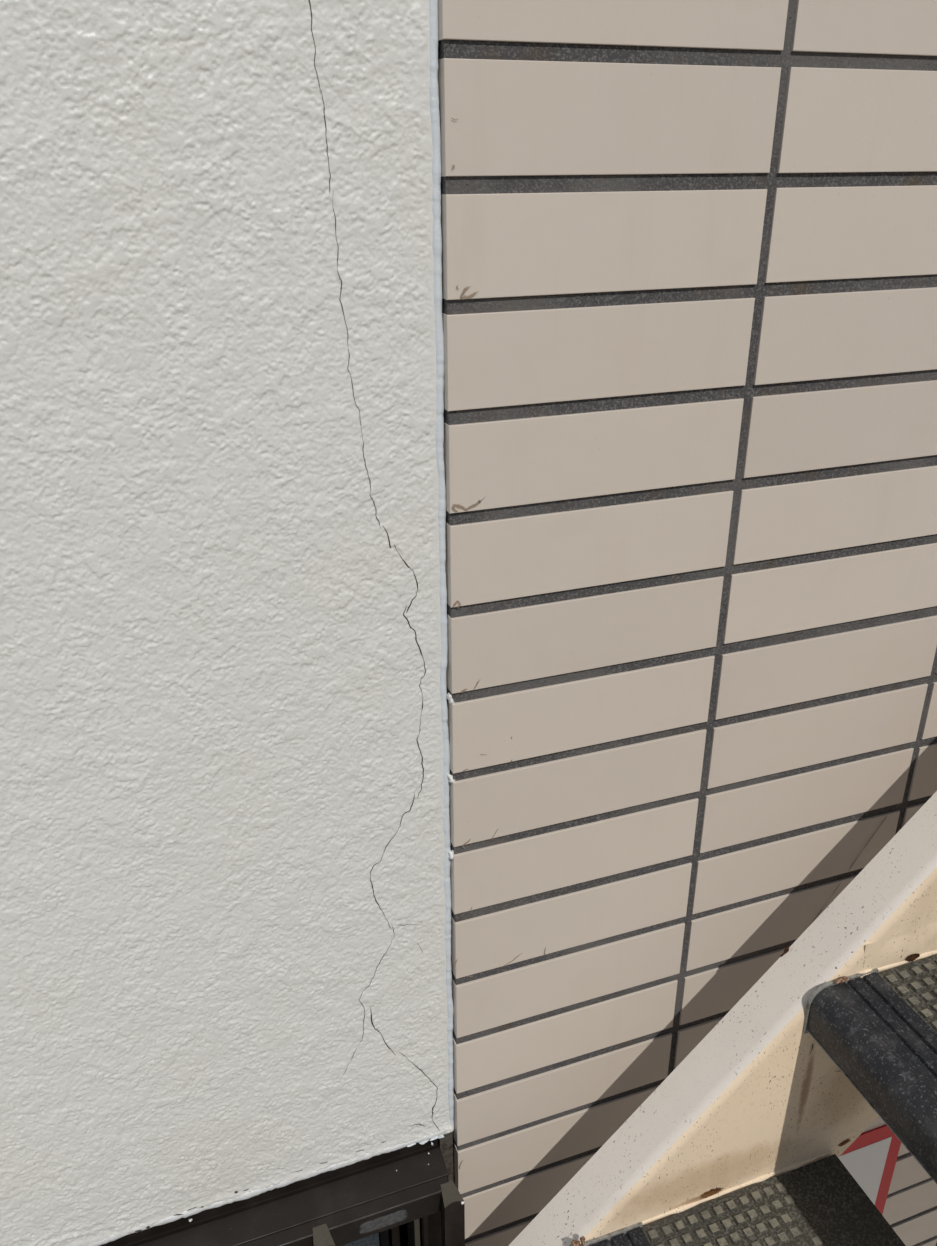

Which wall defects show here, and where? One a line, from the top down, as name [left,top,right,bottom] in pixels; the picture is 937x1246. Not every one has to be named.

crack [309,0,439,1129]